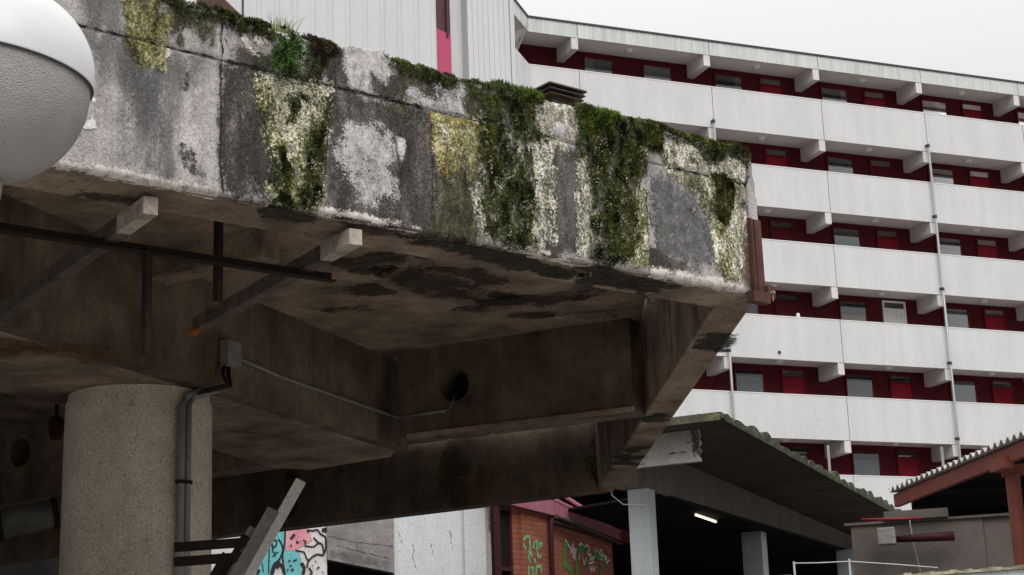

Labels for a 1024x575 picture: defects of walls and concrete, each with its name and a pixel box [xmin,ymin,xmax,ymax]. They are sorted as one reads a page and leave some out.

crack [77,18,488,229]
leakage [81,0,749,330]
leakage [692,332,739,353]